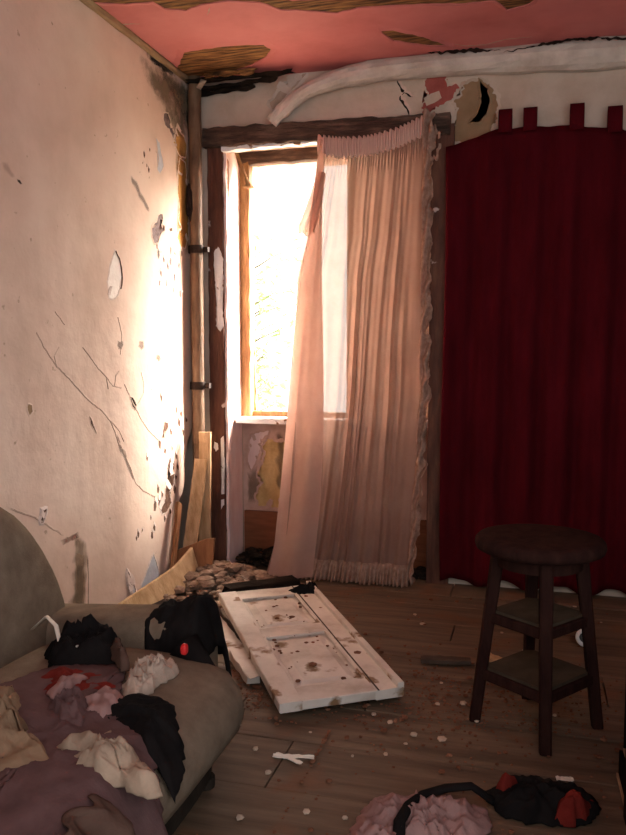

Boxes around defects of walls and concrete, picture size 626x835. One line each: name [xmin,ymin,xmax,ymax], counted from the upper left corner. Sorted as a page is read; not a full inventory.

water stain [150,55,189,141]
spalling [172,41,276,90]
spalling [92,0,538,15]
crack [397,80,414,115]
spalling [378,28,455,47]
peeling [419,77,501,144]
peeling [151,111,189,298]
peeling [106,249,123,300]
crack [36,319,159,501]
spalling [136,404,187,541]
water stain [64,534,89,604]
peeling [125,552,160,595]